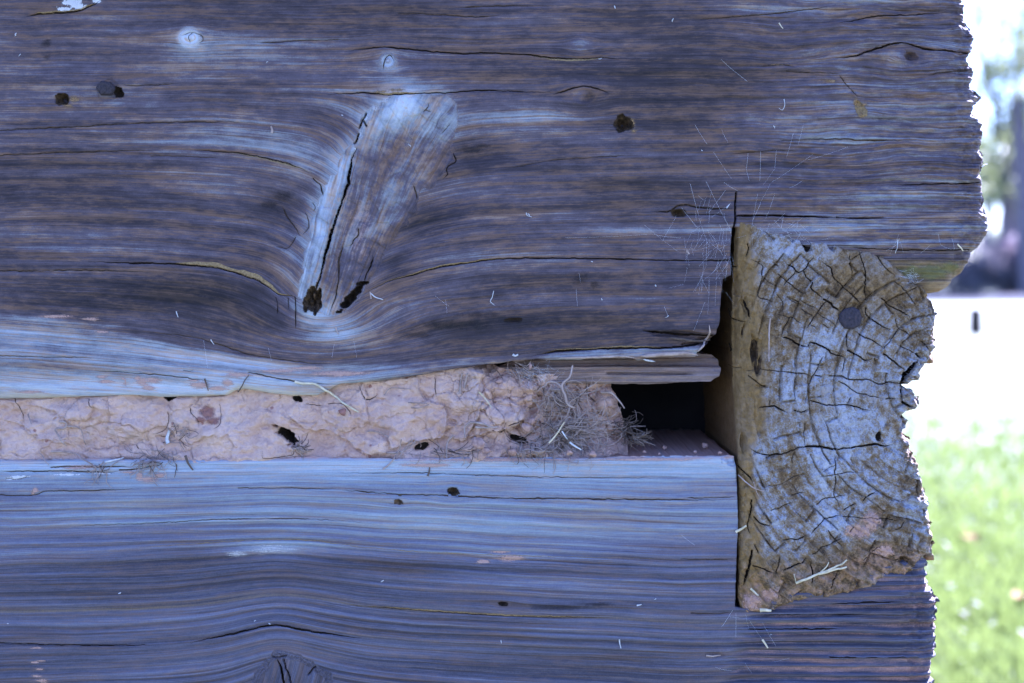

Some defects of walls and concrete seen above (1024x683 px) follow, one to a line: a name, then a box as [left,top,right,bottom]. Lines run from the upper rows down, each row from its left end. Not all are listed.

crack [0,39,640,327]
crack [243,244,969,630]
crack [829,653,911,661]